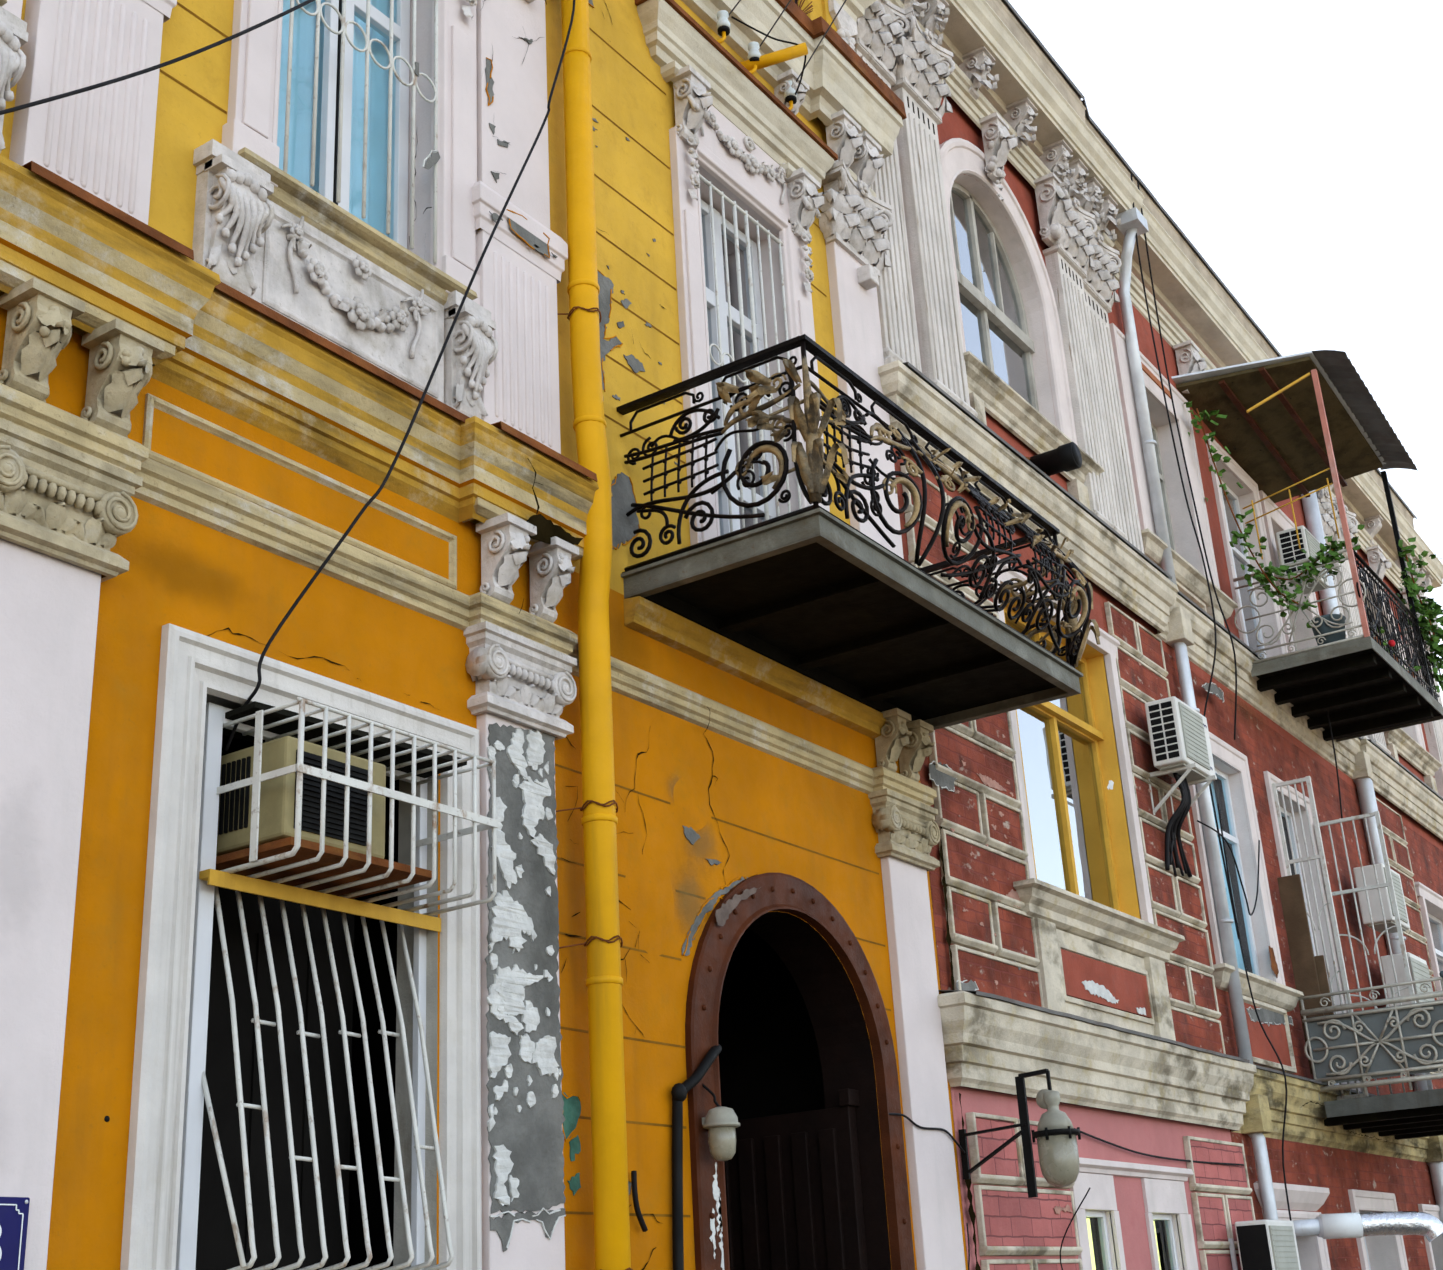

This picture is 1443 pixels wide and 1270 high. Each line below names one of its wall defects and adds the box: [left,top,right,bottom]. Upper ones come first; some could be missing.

peeling [485,57,494,106]
flaking render [597,265,662,404]
crack [616,730,650,854]
flaking render [682,825,701,845]
crack [705,707,730,884]
flaking render [682,874,761,956]
peeling [485,723,581,1252]
peeling [1081,980,1119,1004]
peeling [710,1163,724,1270]